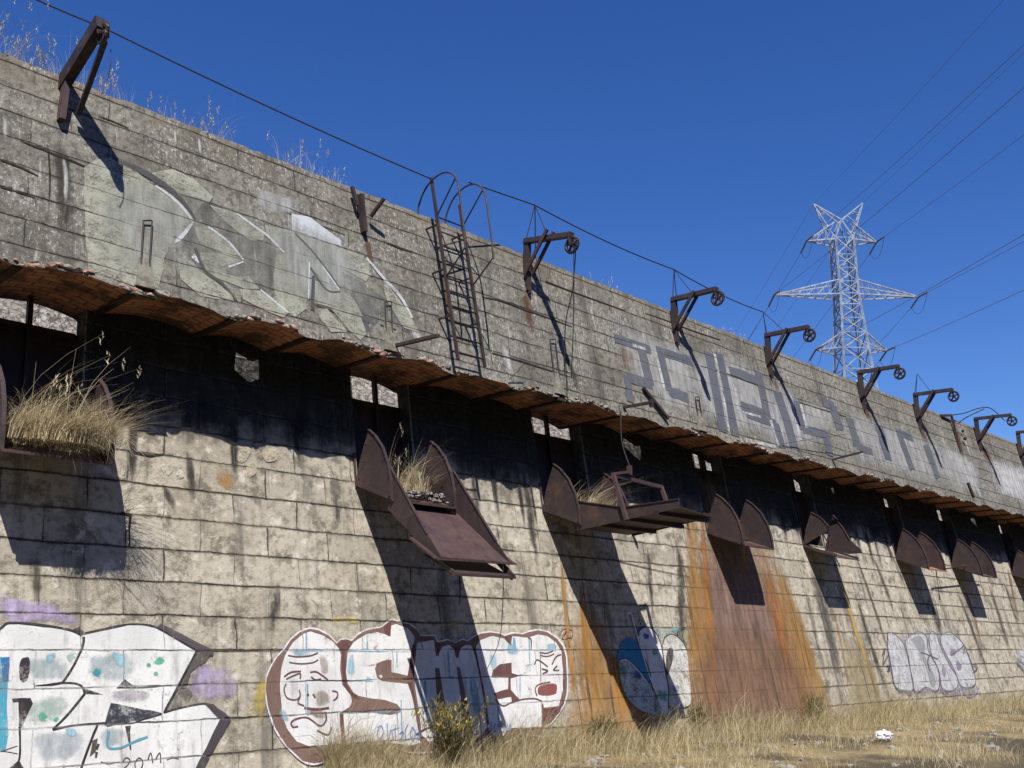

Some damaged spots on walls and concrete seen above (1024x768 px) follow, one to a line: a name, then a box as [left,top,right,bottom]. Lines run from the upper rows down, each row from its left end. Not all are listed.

corrosion [561,577,652,740]
corrosion [677,509,823,726]